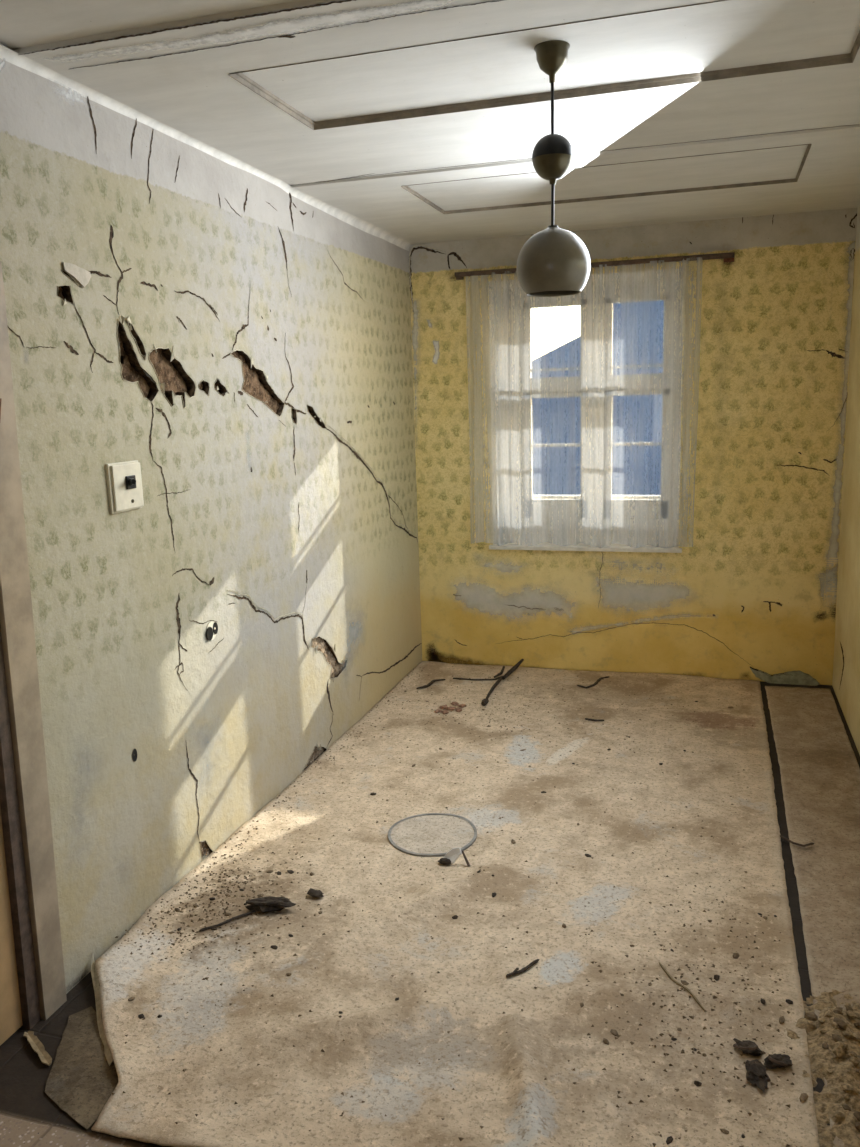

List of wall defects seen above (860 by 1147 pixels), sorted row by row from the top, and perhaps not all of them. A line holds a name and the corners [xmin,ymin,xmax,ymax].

crack [19,0,503,69]
crack [87,97,97,150]
crack [131,118,180,203]
peeling [57,262,91,306]
crack [7,305,114,373]
spalling [117,316,327,429]
crack [89,158,532,542]
crack [149,402,309,691]
peeling [457,585,570,616]
peeling [602,579,688,608]
spalling [311,636,348,682]
crack [186,746,200,843]